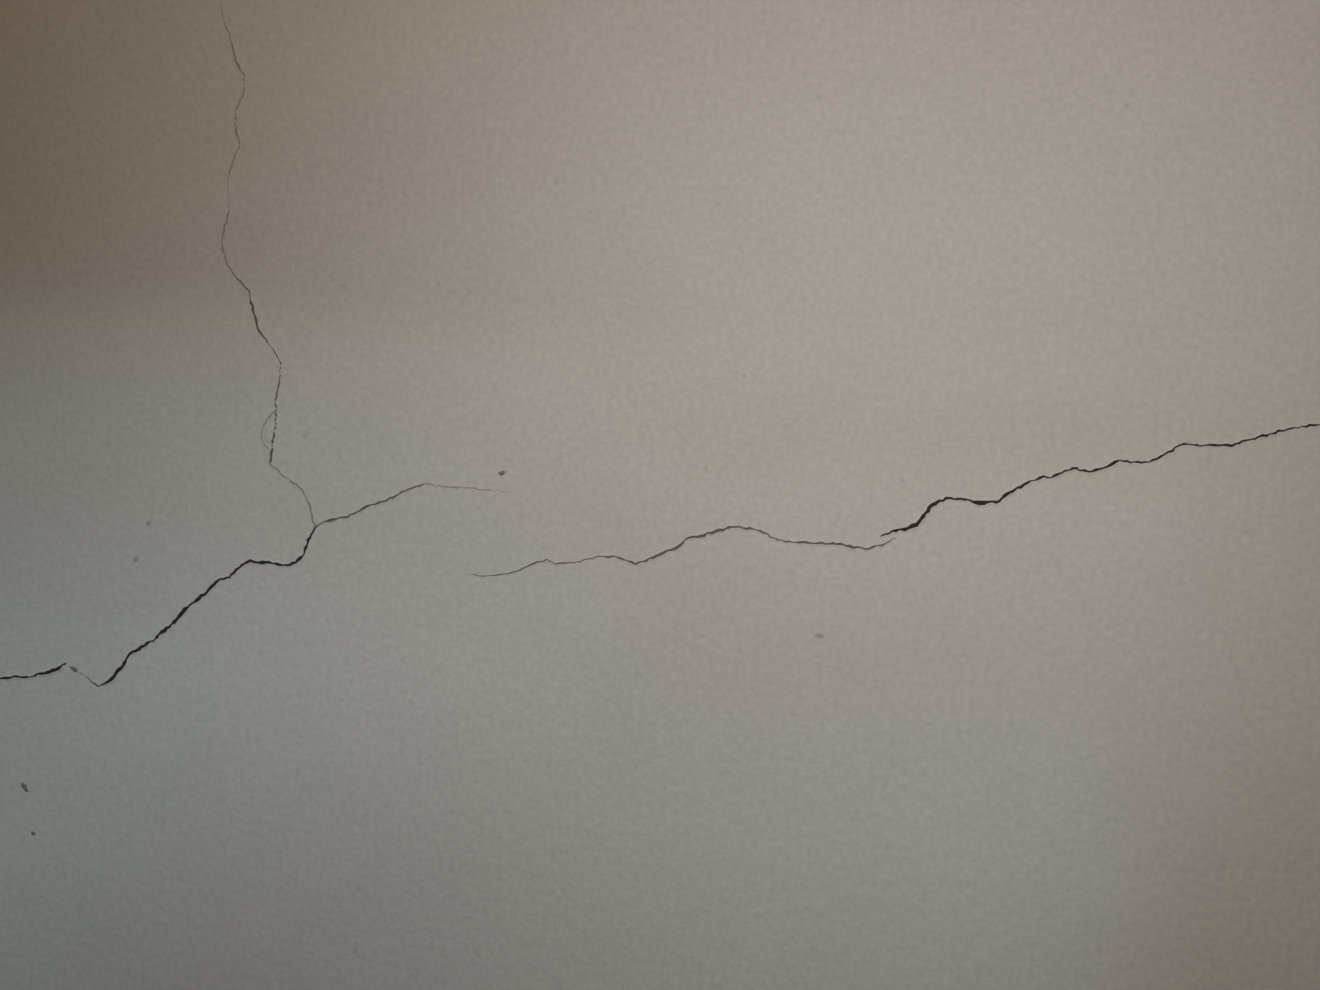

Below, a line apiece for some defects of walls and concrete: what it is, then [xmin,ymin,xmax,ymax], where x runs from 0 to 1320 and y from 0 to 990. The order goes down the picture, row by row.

crack [0,0,511,688]
crack [468,421,1320,578]